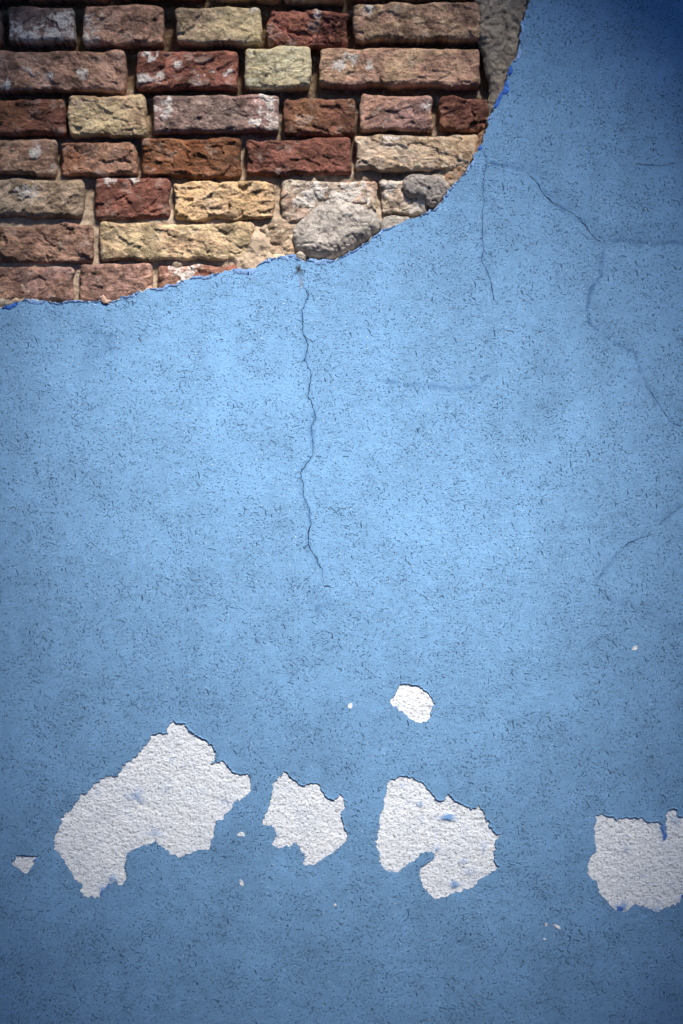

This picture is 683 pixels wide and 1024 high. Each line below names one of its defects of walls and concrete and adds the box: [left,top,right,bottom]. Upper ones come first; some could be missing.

spalling [0,0,529,310]
crack [294,275,353,588]
peeling [390,682,435,723]
peeling [11,854,39,873]
peeling [53,719,252,898]
peeling [262,770,349,866]
peeling [375,774,502,900]
peeling [587,807,683,912]